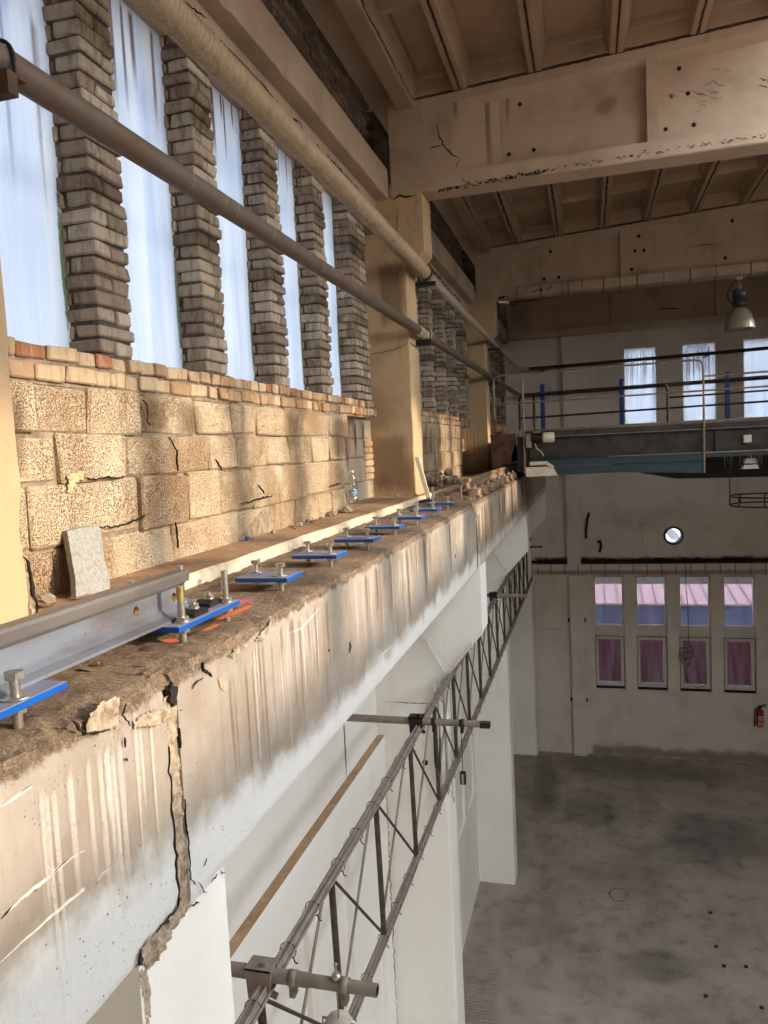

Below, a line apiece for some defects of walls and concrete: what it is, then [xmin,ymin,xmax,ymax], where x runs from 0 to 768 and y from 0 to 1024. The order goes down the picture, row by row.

crack [361,0,768,101]
crack [430,122,768,249]
crack [142,400,179,471]
crack [86,474,124,482]
crack [99,497,179,548]
crack [240,485,273,504]
spalling [86,684,178,761]